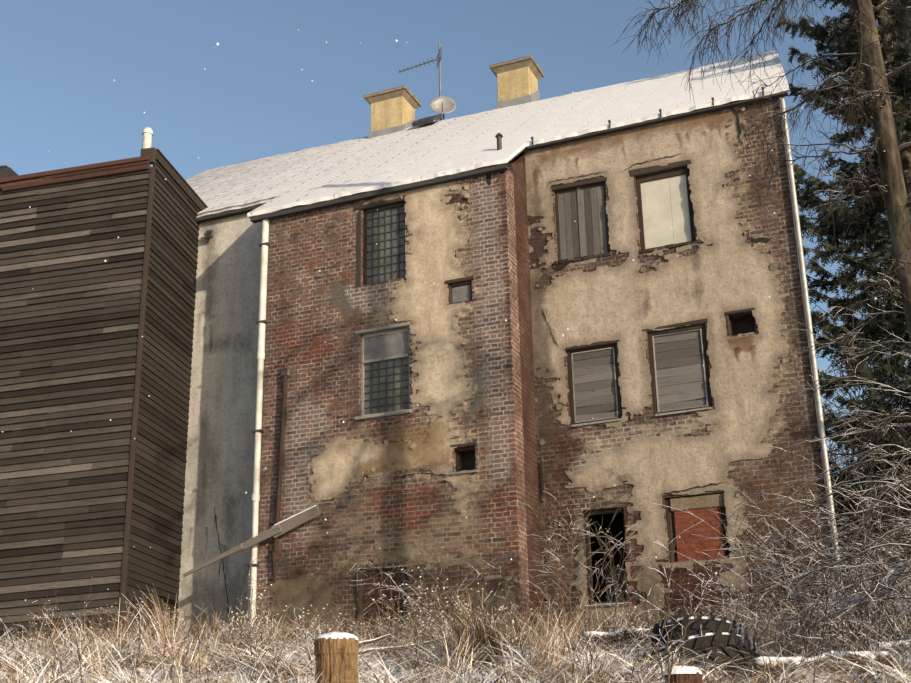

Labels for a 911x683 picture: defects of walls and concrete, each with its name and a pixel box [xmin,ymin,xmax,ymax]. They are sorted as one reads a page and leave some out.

peeling [307,179,490,529]
spalling [528,215,713,290]
spalling [656,98,836,633]
peeling [260,571,344,640]
peeling [454,575,520,627]
spalling [534,367,715,633]